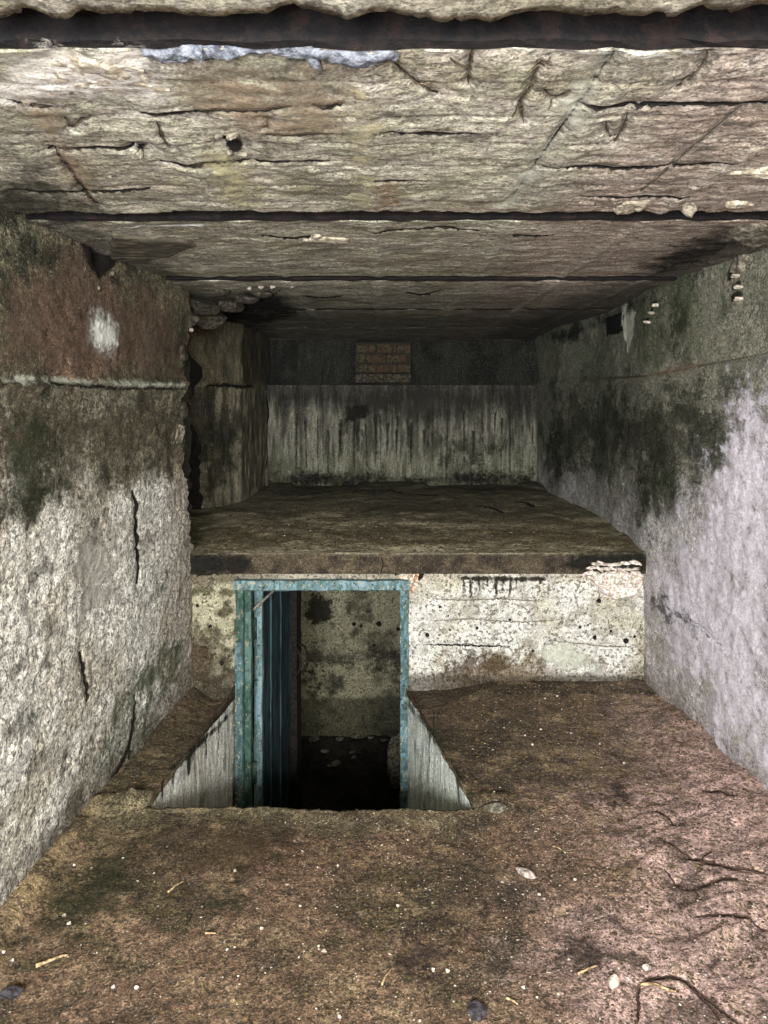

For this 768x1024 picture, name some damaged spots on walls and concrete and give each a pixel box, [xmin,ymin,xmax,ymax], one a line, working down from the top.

crack [8,99,150,204]
crack [135,101,342,169]
crack [372,176,425,184]
crack [380,129,482,137]
crack [511,49,768,200]
leakage [0,365,241,505]
leakage [268,385,537,486]
crack [131,490,139,584]
leakage [461,576,546,599]
spalling [580,560,644,603]
leakage [539,368,768,787]
crack [79,651,89,702]